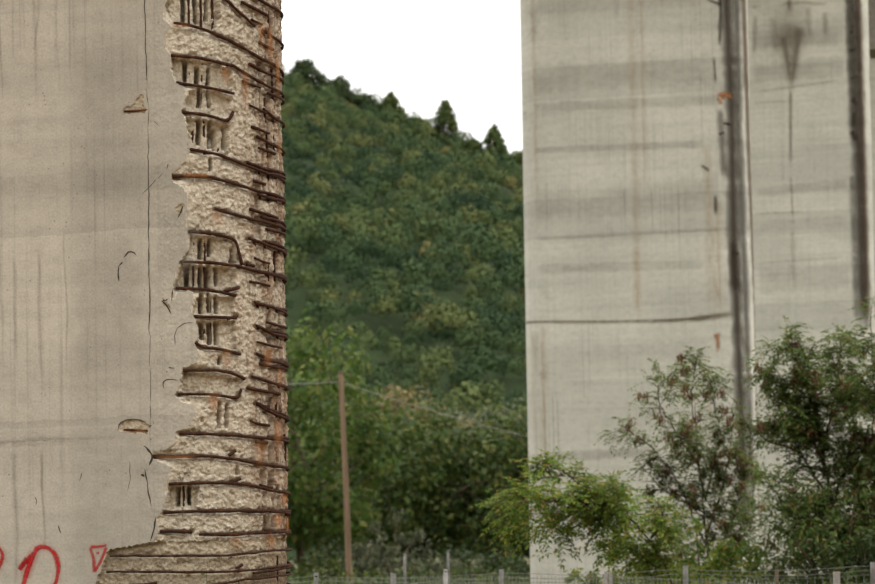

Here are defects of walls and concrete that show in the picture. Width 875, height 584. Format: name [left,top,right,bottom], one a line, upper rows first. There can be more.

spalling [96,0,292,584]